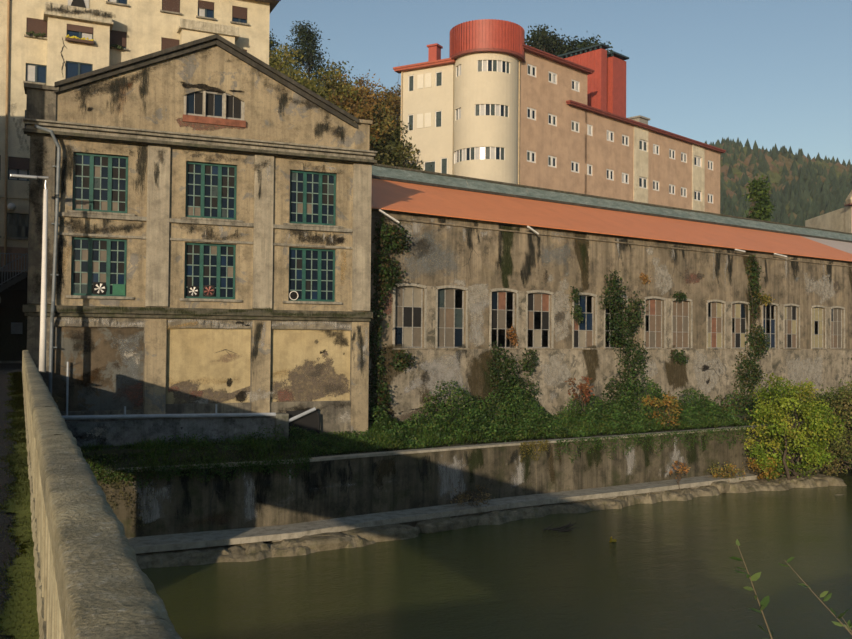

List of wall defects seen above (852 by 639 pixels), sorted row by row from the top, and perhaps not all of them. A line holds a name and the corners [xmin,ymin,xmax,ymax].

leakage [76,67,156,115]
leakage [520,230,541,284]
leakage [71,332,95,354]
leakage [75,368,100,393]
spalling [167,378,250,404]
spalling [272,350,350,402]
leakage [203,466,271,520]
leakage [418,448,484,500]
leakage [508,445,533,486]
leakage [624,437,662,474]
leakage [665,433,707,477]